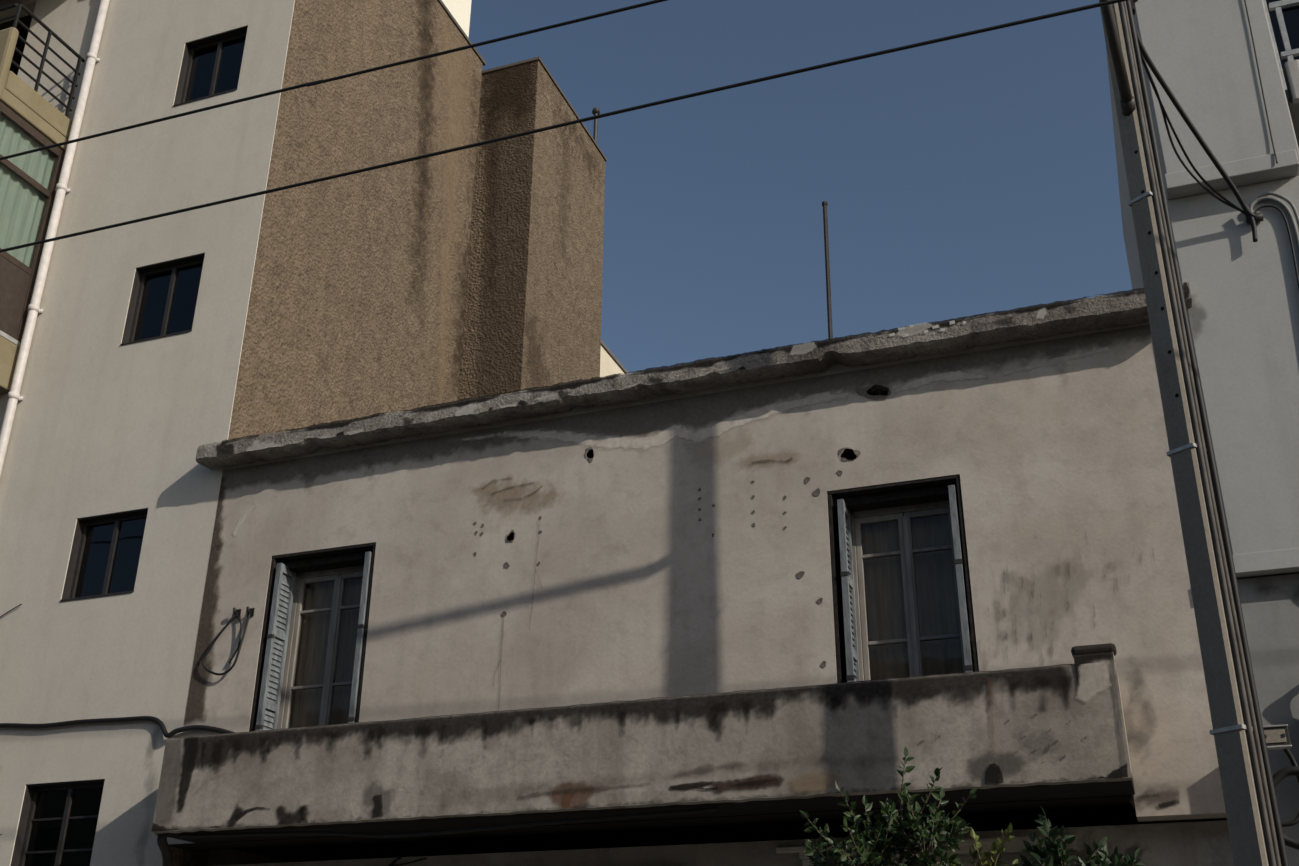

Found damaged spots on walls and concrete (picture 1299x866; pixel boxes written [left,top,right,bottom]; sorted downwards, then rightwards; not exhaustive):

water stain [488,65,530,117]
peeling [889,321,966,337]
peeling [463,371,987,463]
spalling [837,447,861,476]
water stain [162,288,1151,830]
peeling [1078,662,1108,701]